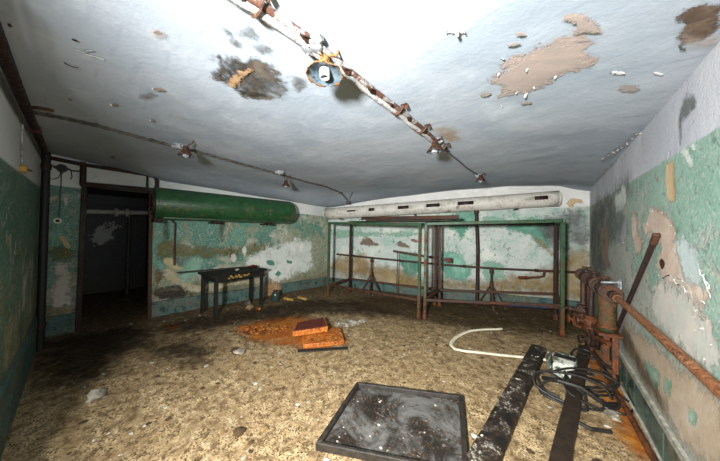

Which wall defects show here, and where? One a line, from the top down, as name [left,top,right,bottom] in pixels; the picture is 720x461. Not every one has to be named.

damp [211,25,304,100]
peeling [480,12,603,107]
flaking render [675,2,720,51]
damp [679,97,695,122]
flaking render [614,160,720,375]